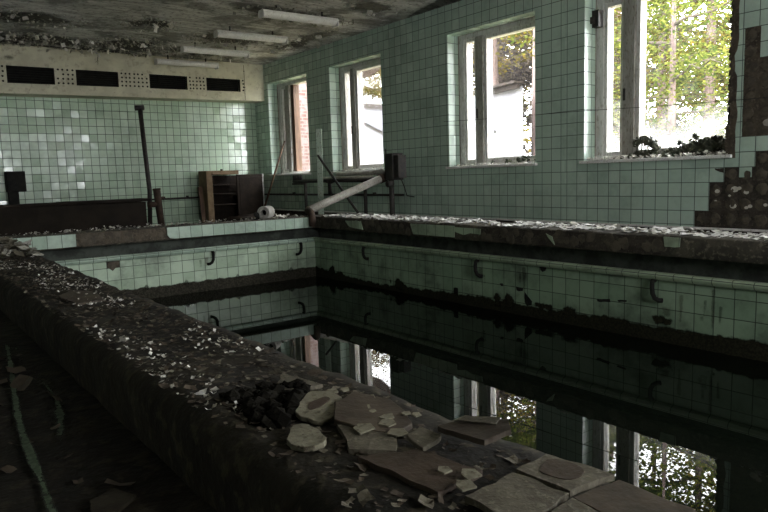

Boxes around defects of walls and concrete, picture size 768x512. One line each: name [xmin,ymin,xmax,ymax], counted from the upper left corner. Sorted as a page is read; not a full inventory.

peeling [0,1,406,63]
peeling [694,0,768,235]
spalling [278,373,615,512]